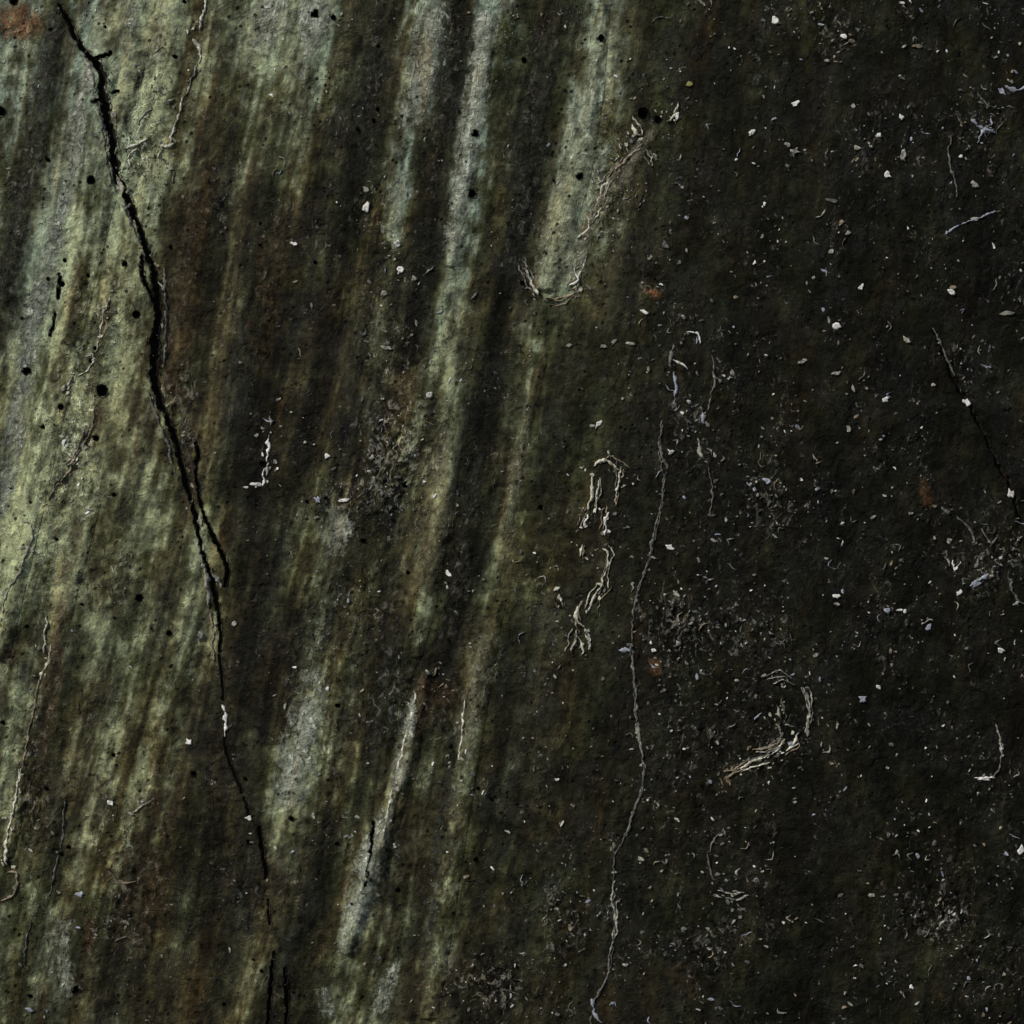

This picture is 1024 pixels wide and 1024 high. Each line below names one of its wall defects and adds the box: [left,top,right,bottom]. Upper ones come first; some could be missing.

damp [248,0,333,79]
damp [399,1,449,128]
damp [444,9,495,265]
damp [536,42,655,287]
damp [0,67,92,521]
crack [57,0,272,924]
damp [321,505,353,554]
damp [271,669,323,811]
damp [390,702,416,792]
damp [338,809,393,953]
crack [266,951,290,1024]
damp [373,961,400,1013]